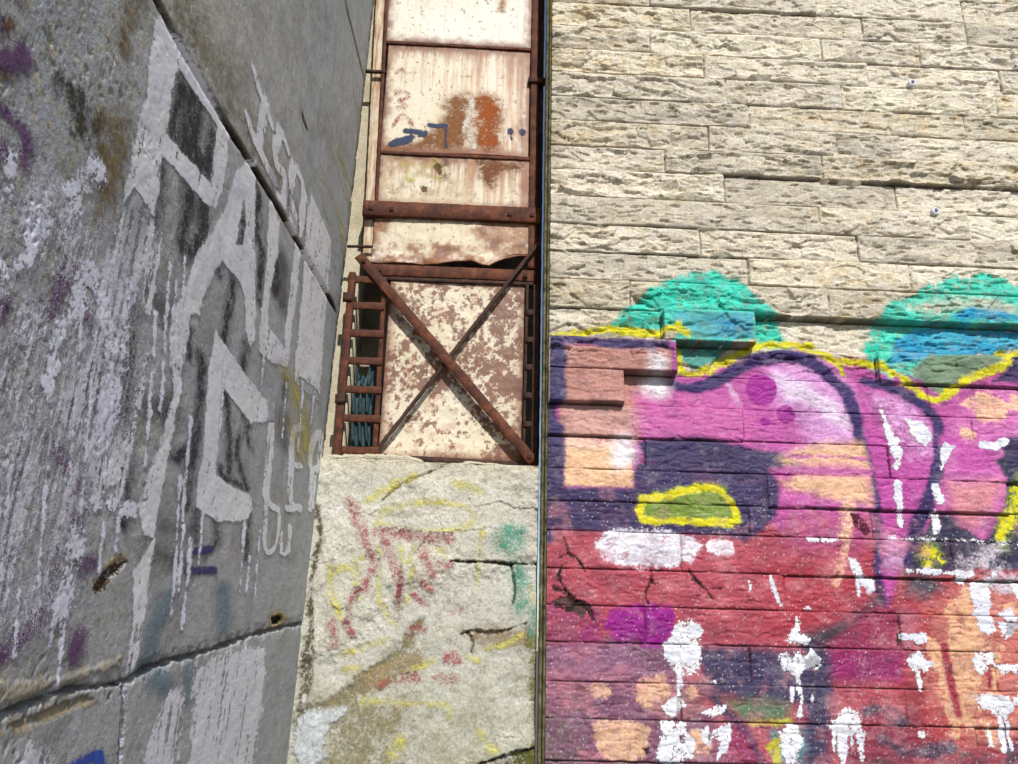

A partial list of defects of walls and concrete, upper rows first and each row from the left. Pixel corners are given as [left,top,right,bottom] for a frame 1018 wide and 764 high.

corrosion [384,93,522,188]
crack [450,537,594,627]
crack [645,567,661,605]
crack [688,571,722,599]
crack [459,631,474,654]